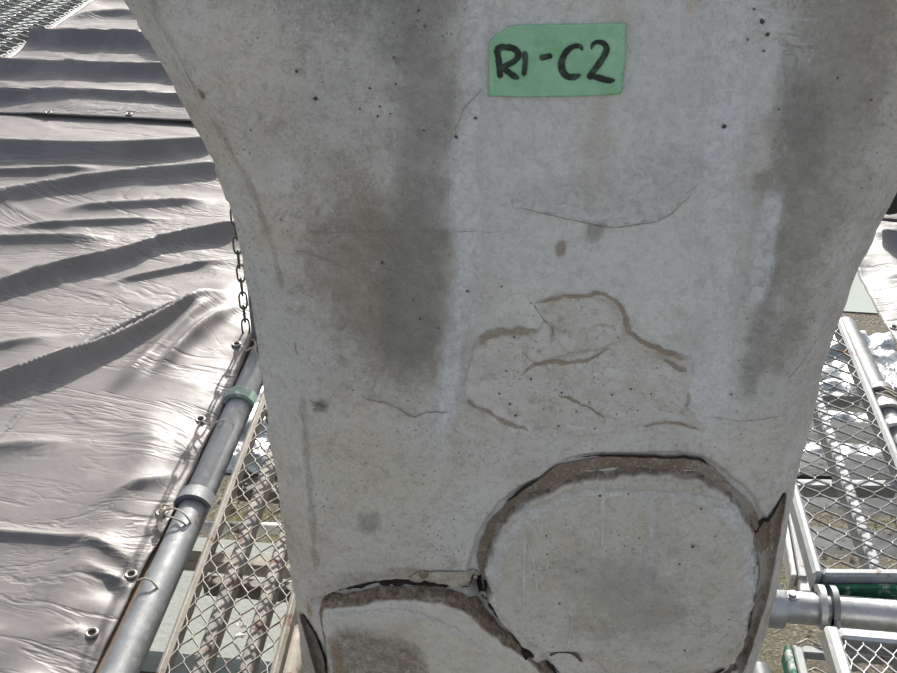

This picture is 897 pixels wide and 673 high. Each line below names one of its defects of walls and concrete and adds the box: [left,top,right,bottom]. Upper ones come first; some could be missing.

damp [435,0,486,442]
crack [480,327,536,344]
crack [543,291,687,372]
crack [522,350,606,375]
spalling [464,291,703,457]
crack [363,397,446,418]
crack [468,400,528,431]
crack [559,395,604,418]
crack [644,394,698,430]
crack [332,454,786,618]
crack [522,647,583,673]
crack [716,665,737,673]